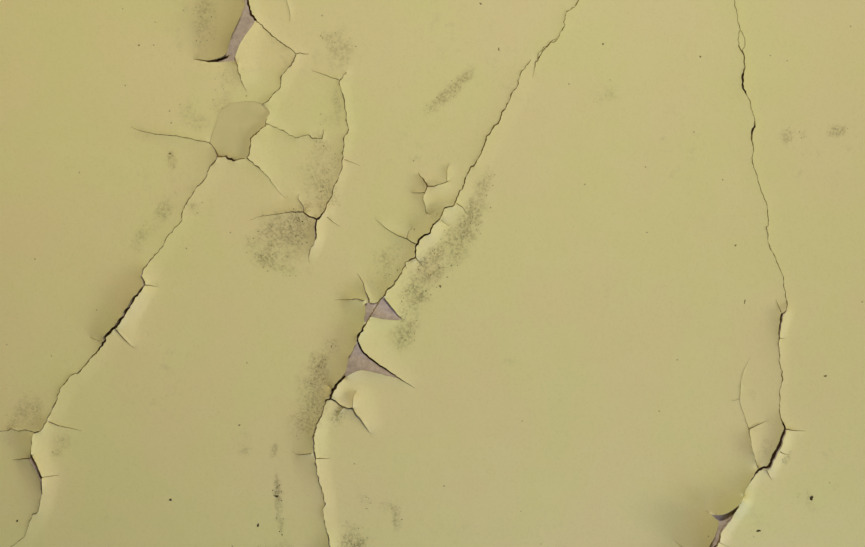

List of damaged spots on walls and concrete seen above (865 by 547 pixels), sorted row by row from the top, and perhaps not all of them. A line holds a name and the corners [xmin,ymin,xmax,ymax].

crack [0,0,360,547]
peeling [302,253,423,441]
peeling [603,437,772,547]